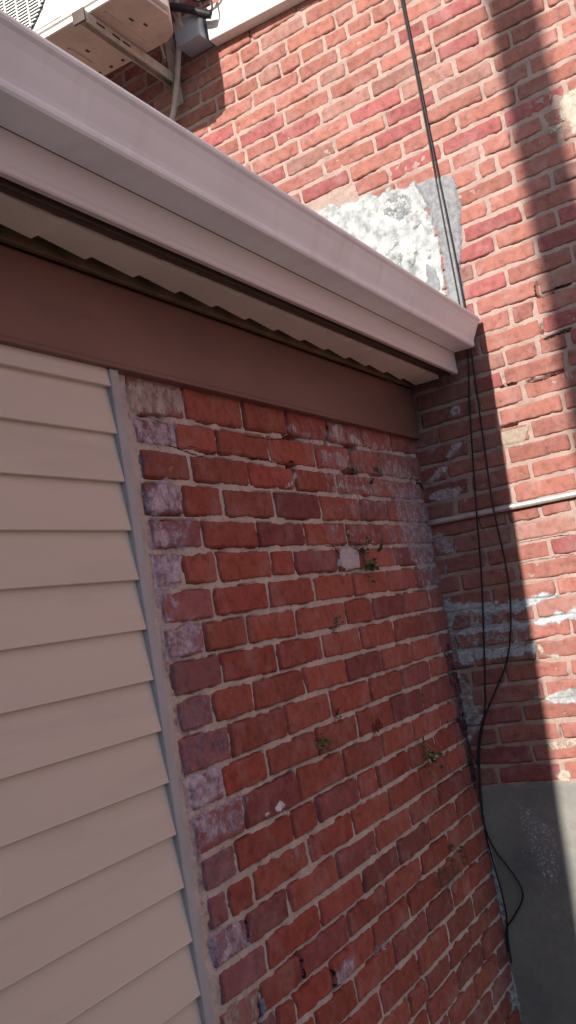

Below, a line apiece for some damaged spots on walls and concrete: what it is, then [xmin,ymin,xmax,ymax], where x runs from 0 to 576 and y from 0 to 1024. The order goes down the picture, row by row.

peeling [318,181,447,296]
crack [138,394,285,466]
water stain [286,423,466,591]
water stain [443,592,576,740]